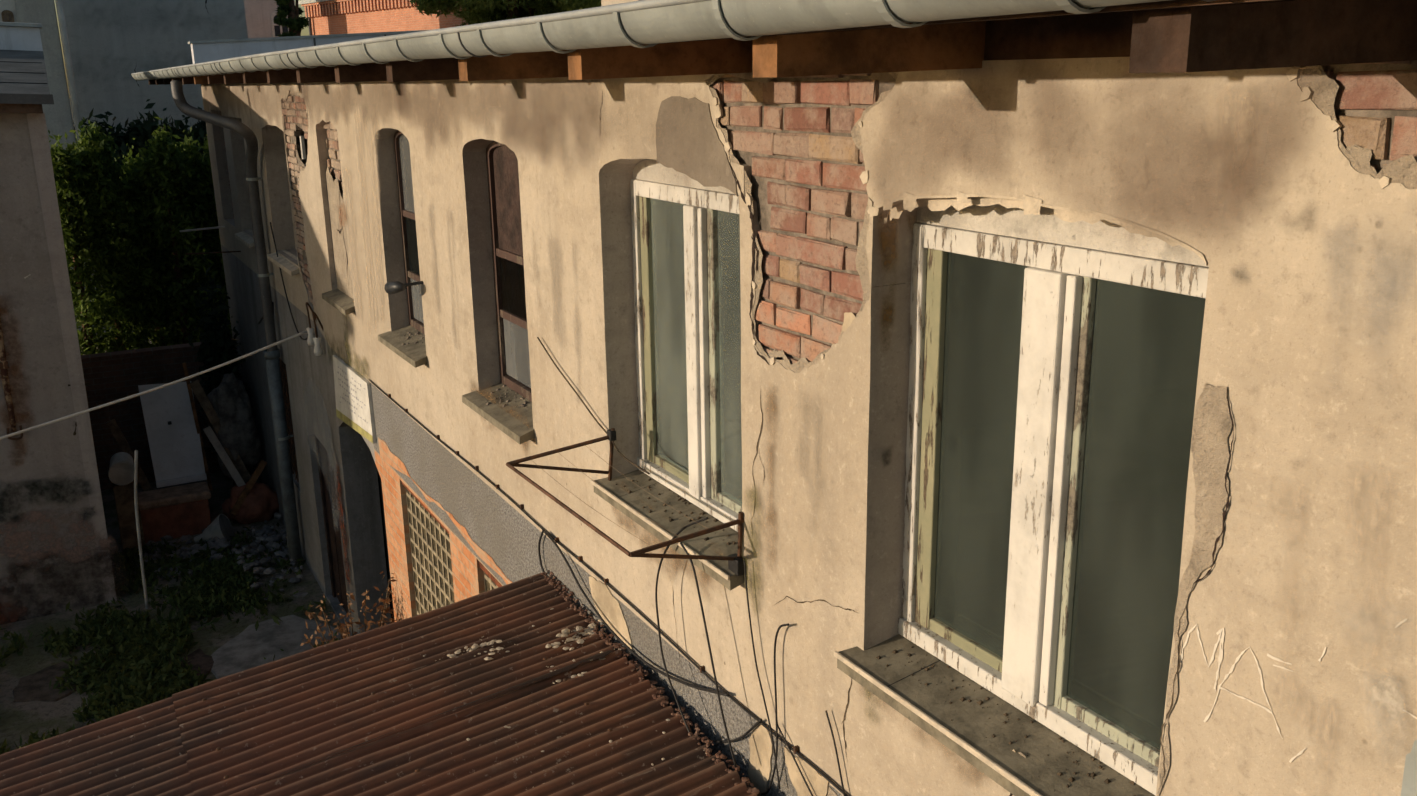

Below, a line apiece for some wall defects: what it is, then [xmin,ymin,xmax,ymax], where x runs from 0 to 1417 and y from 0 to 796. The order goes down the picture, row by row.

flaking render [281,87,315,313]
flaking render [706,61,1208,373]
flaking render [1286,60,1417,189]
corrosion [0,307,30,463]
crack [730,164,769,543]
water stain [0,480,93,521]
crack [773,596,855,612]
flaking render [1157,383,1234,796]